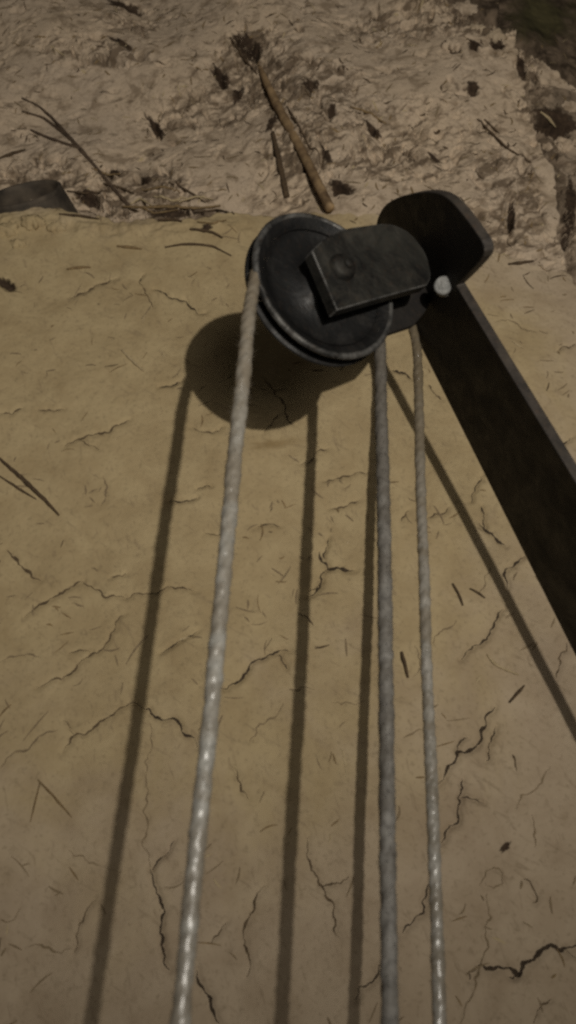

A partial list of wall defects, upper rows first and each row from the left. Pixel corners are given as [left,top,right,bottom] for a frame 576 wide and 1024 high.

crack [65,420,130,450]
crack [7,550,195,688]
crack [298,539,355,626]
crack [221,650,365,742]
crack [438,707,548,846]
crack [1,702,197,970]
crack [306,837,348,936]
crack [461,867,576,1022]
crack [196,972,220,1024]